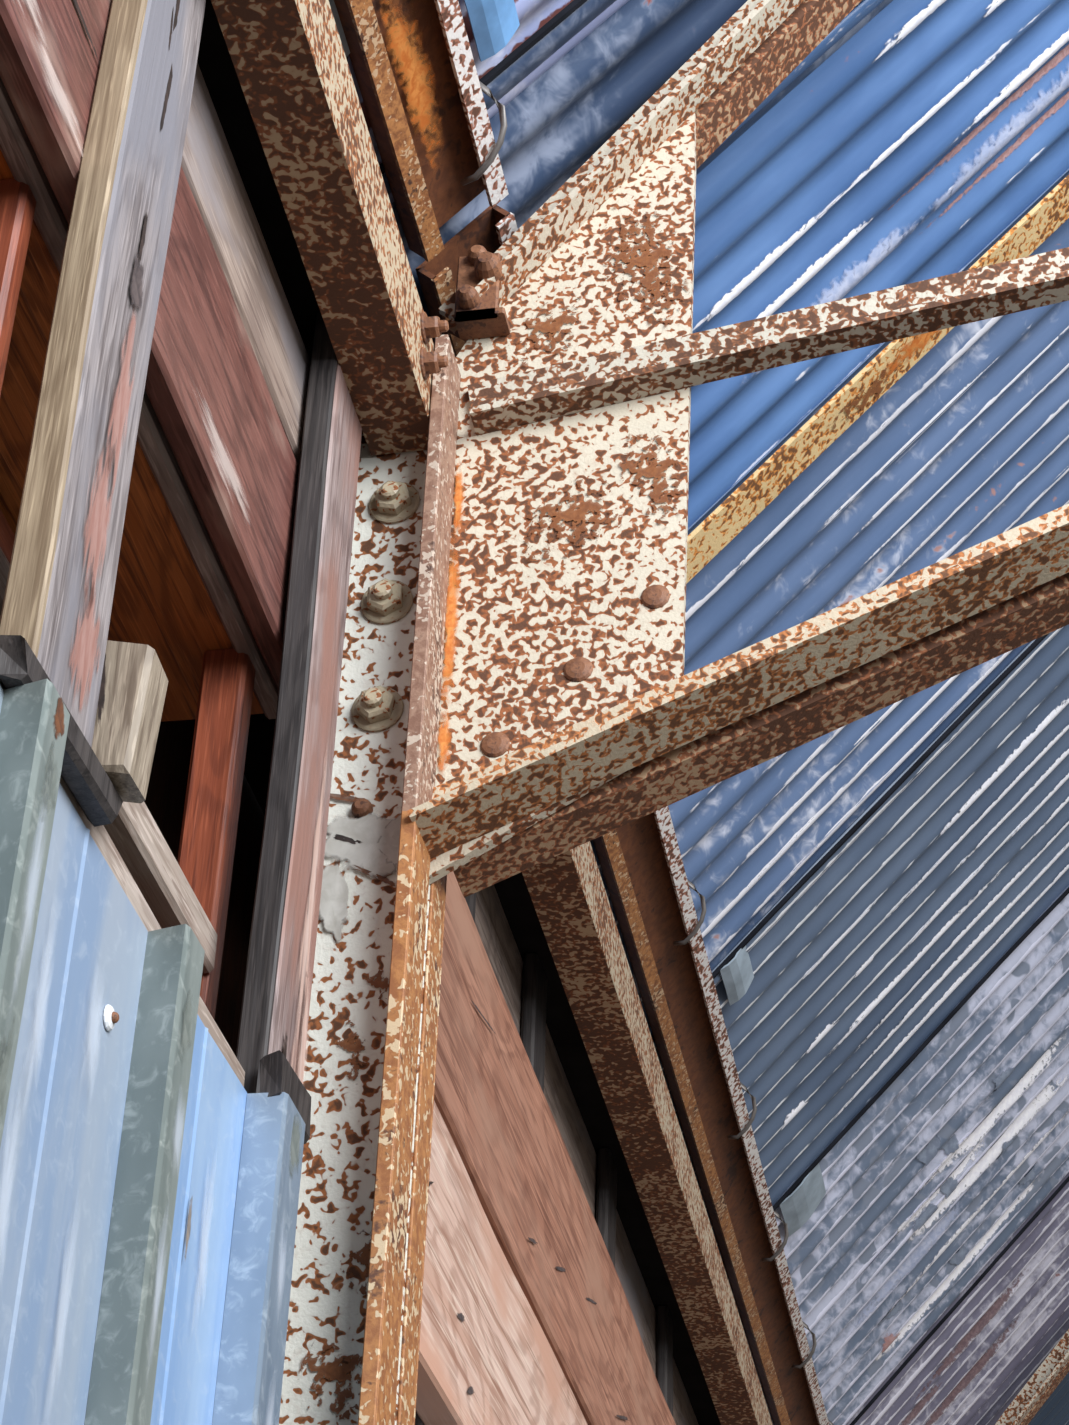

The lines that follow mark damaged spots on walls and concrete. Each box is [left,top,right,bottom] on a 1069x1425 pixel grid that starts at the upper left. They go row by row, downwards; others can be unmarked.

rust [382,0,441,165]
rust [604,206,688,326]
rust [507,296,583,366]
rust [830,330,940,429]
rust [454,473,464,530]
rust [524,434,680,561]
rust [441,552,460,697]
rust [438,715,451,771]
peeling [291,772,401,1084]
rust [365,970,389,1004]
rust [337,1020,366,1080]